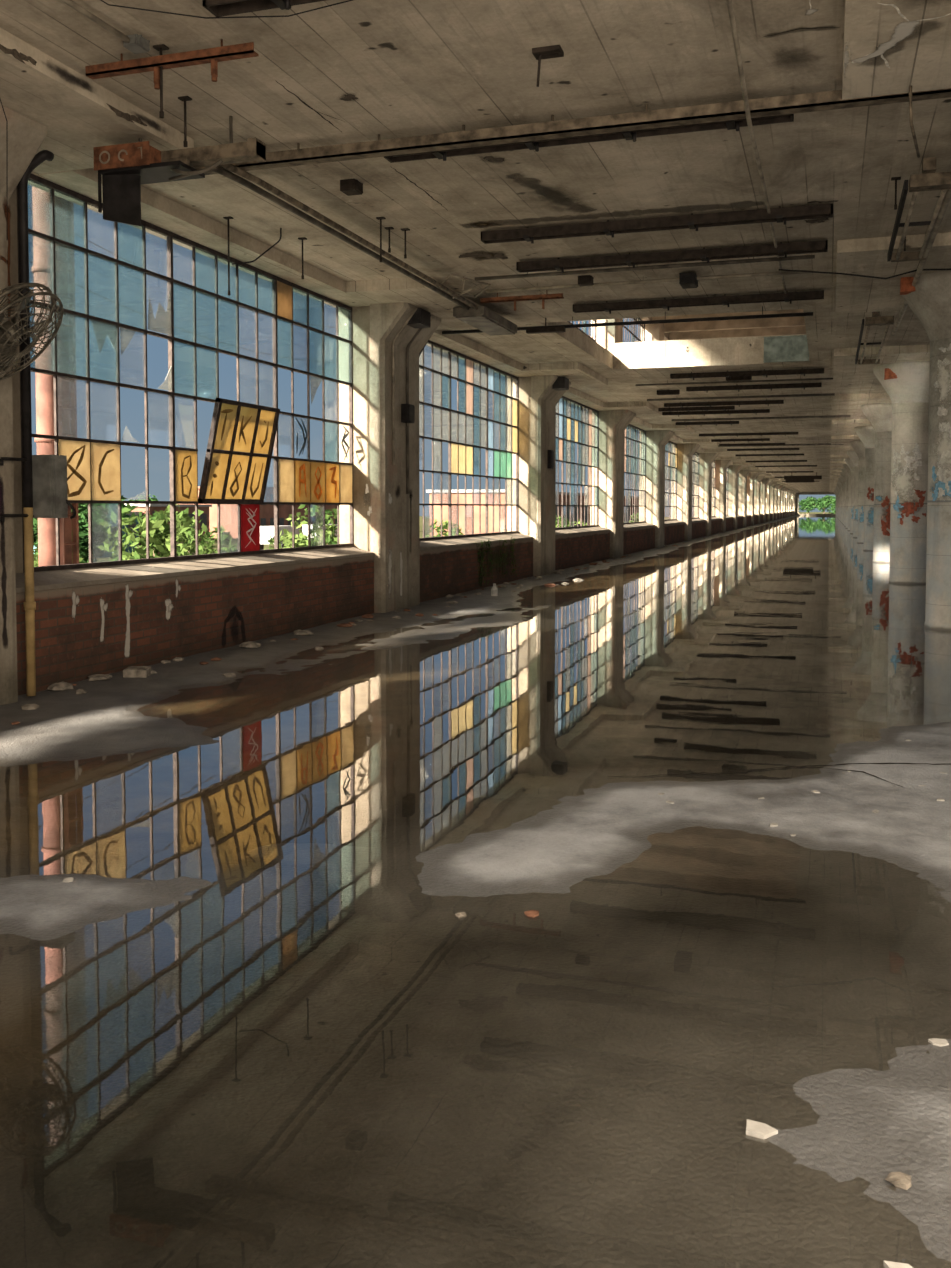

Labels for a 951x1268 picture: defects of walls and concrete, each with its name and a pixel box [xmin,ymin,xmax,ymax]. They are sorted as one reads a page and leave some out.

peeling [851,343,951,536]